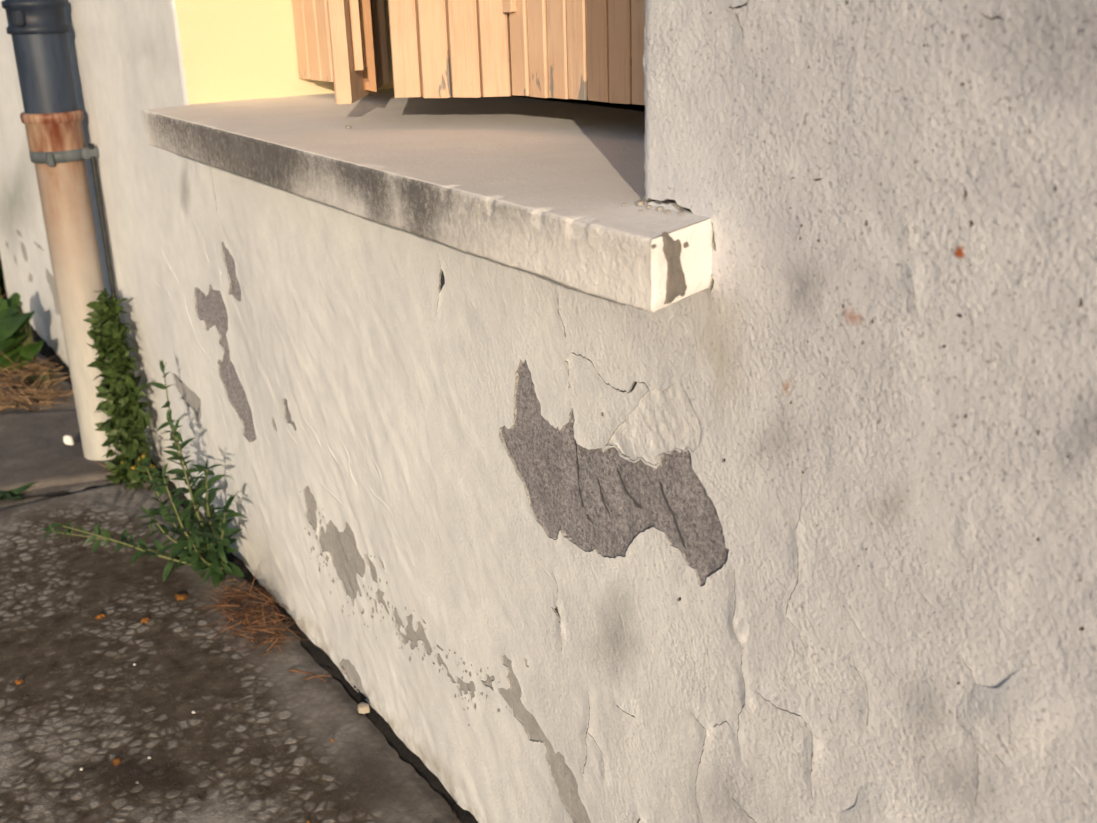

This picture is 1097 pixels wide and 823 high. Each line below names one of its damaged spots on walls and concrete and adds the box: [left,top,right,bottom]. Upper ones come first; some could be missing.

peeling [172,373,201,426]
spalling [194,242,257,442]
crack [557,298,649,404]
spalling [499,359,729,587]
spalling [652,232,689,304]
peeling [300,486,591,823]